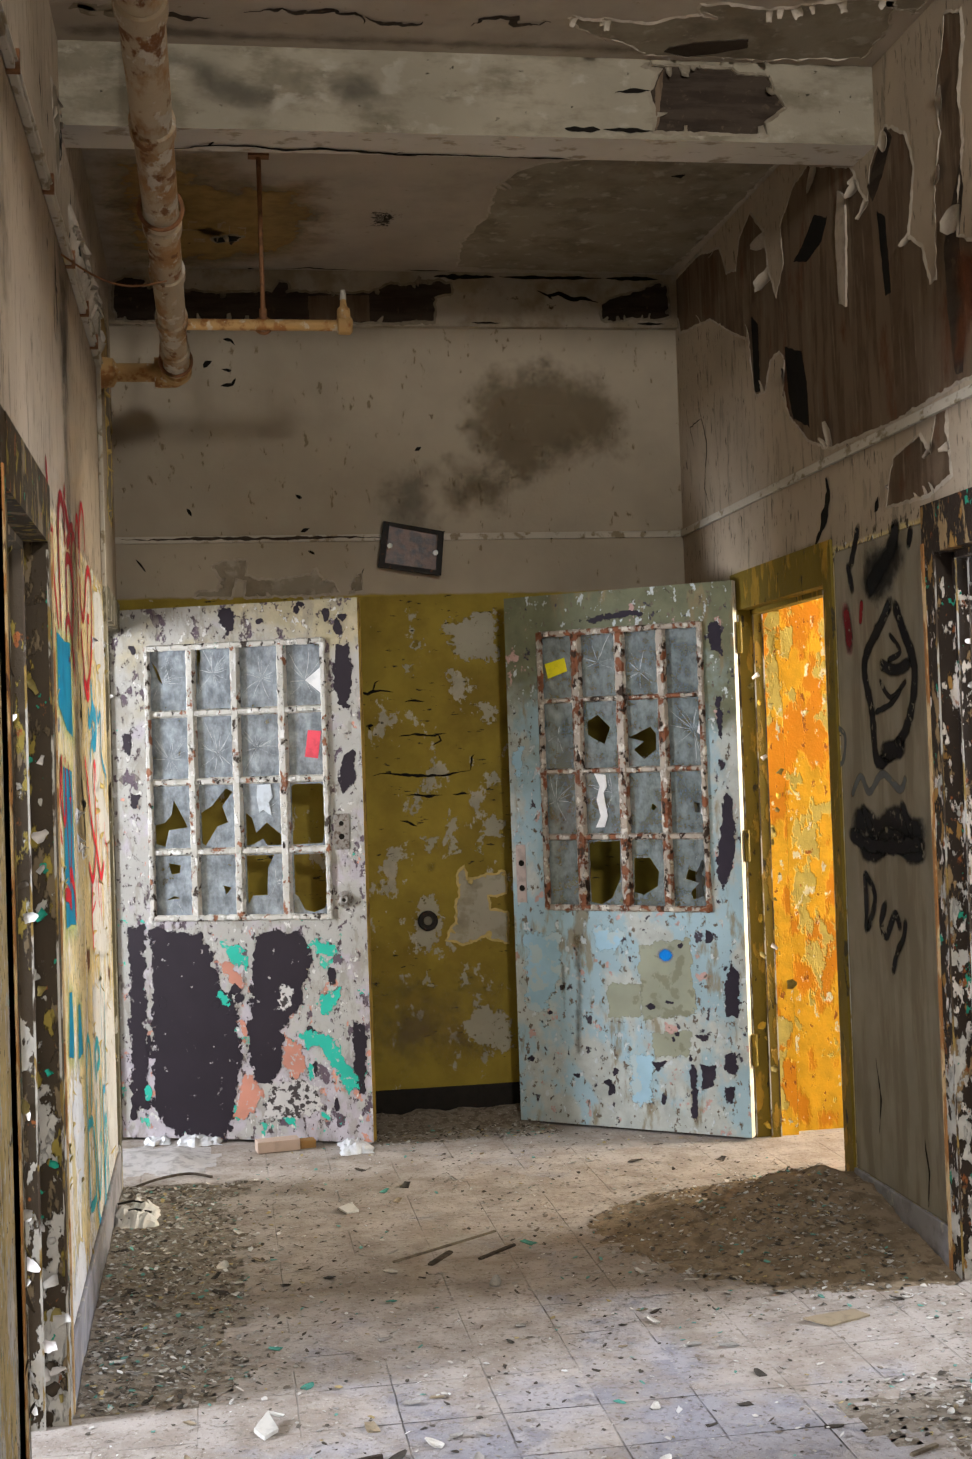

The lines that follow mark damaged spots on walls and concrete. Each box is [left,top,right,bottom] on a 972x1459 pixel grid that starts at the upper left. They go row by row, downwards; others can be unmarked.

peeling [168,12,209,21]
spalling [68,203,156,353]
leakage [176,158,319,264]
peeling [184,0,972,509]
leakage [478,376,614,479]
peeling [92,579,113,698]
peeling [441,608,500,685]
peeling [478,701,499,725]
peeling [412,815,510,988]
peeling [23,781,118,1159]
peeling [457,968,515,1054]
peeling [49,1070,86,1190]